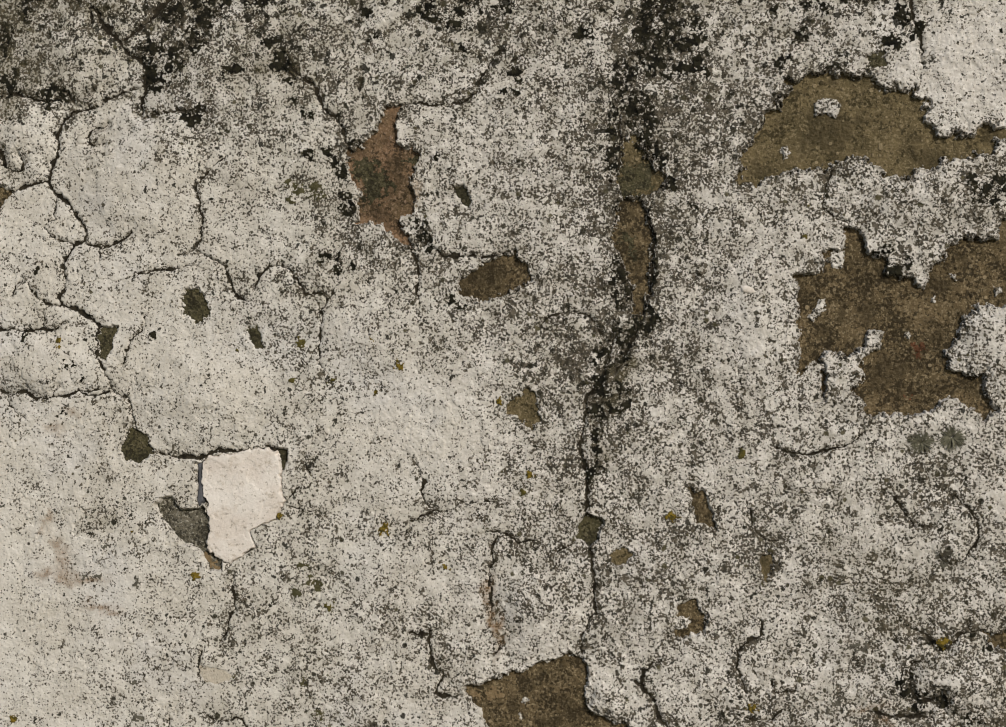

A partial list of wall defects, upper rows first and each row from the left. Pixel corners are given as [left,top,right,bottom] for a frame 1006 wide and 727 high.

crack [0,0,209,425]
crack [133,154,334,371]
spalling [343,102,423,257]
spalling [456,248,533,304]
crack [543,114,655,515]
spalling [735,51,1006,188]
spalling [789,219,1006,421]
crack [156,445,277,461]
spalling [154,495,223,572]
crack [409,622,451,698]
crack [485,530,597,653]
spalling [461,652,628,727]